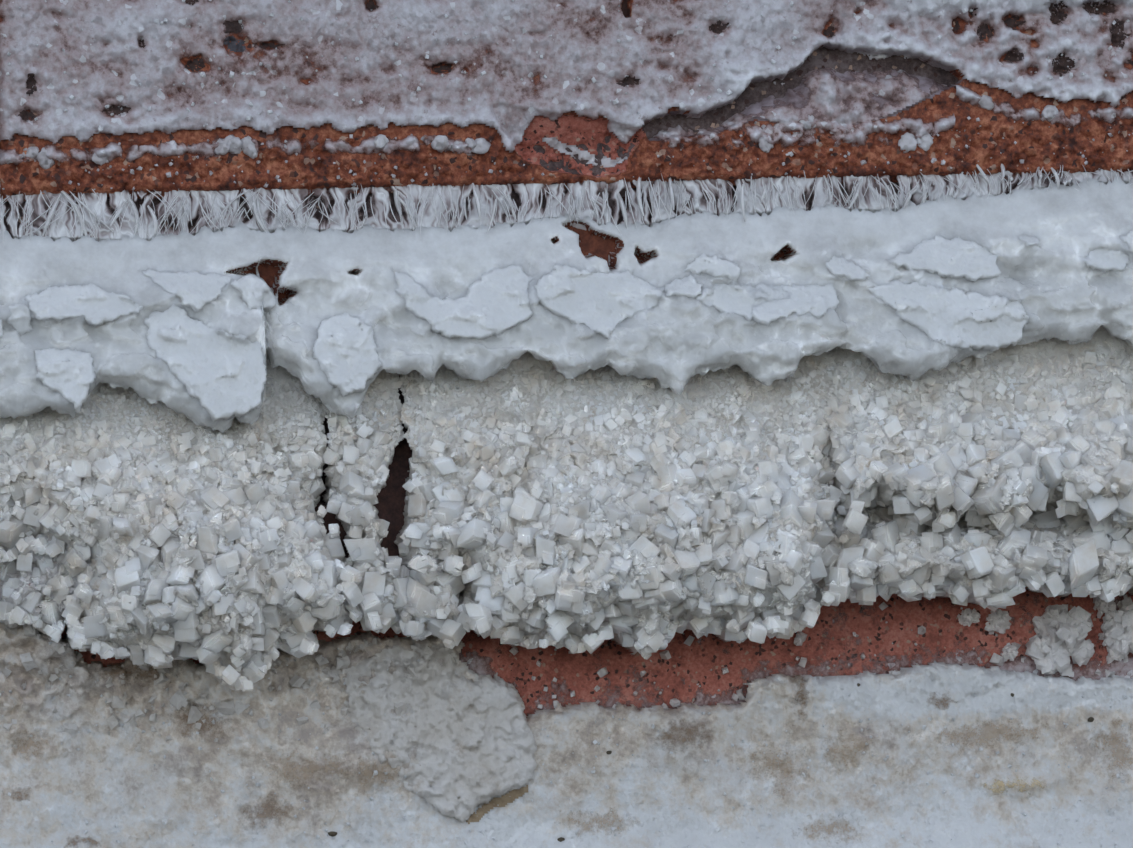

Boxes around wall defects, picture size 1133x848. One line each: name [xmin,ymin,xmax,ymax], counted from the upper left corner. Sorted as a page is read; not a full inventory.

water stain [0,0,1133,170]
crack [621,0,630,18]
spalling [616,75,641,87]
spalling [740,68,962,125]
spalling [1003,48,1024,63]
spalling [1049,1,1068,24]
spalling [1052,52,1075,77]
spalling [1082,0,1133,66]
spalling [515,115,663,178]
water stain [0,171,1133,848]